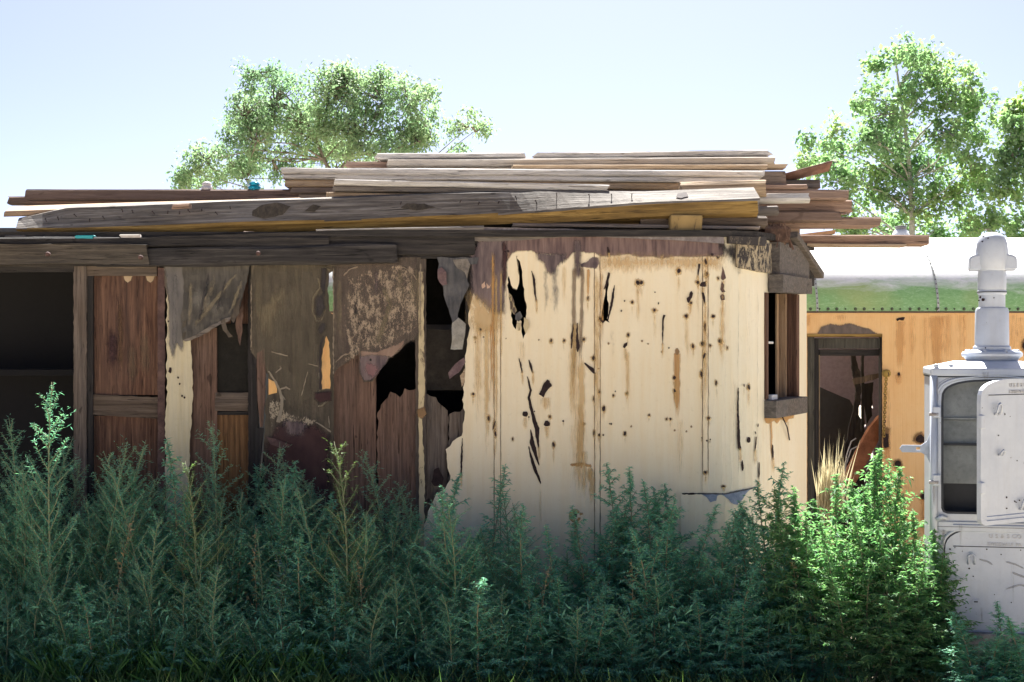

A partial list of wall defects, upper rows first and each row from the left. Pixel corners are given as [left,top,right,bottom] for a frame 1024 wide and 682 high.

peeling [164,267,184,354]
peeling [332,264,422,374]
corrosion [474,237,736,396]
corrosion [818,323,877,334]
crack [519,359,541,484]
corrosion [661,347,692,432]